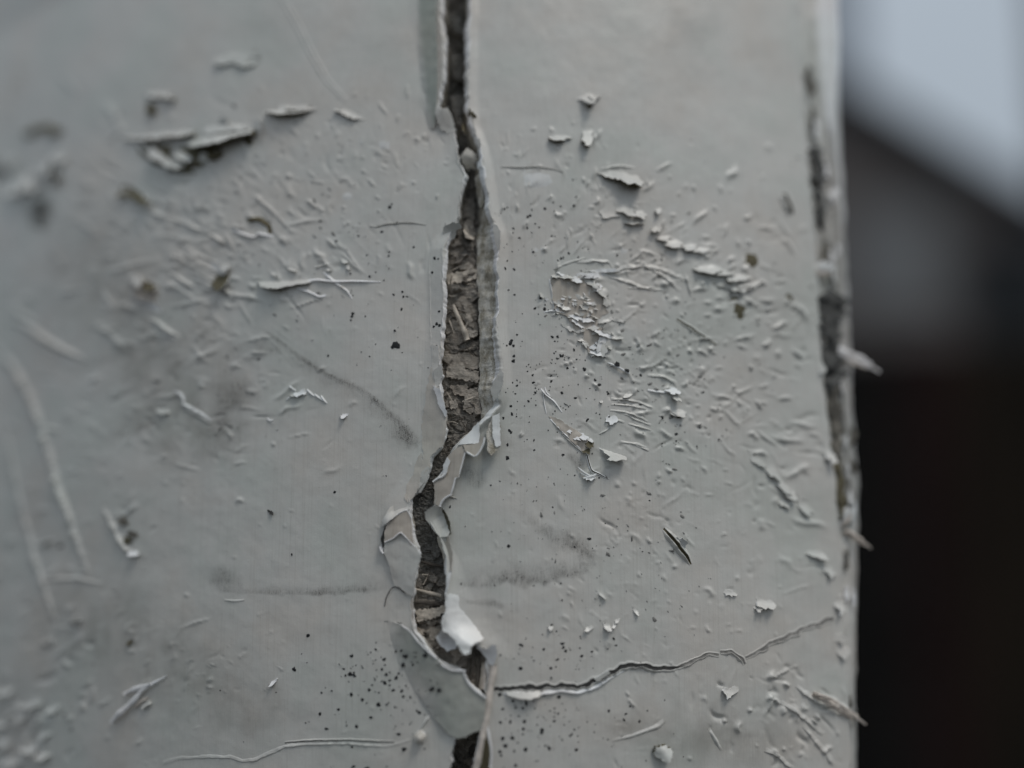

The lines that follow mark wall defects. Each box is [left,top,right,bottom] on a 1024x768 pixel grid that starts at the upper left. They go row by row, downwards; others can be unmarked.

peeling [145,88,176,116]
peeling [123,103,316,174]
peeling [598,164,644,188]
peeling [539,203,768,374]
crack [370,0,858,768]
peeling [647,374,687,419]
spalling [549,416,627,481]
peeling [780,700,837,766]